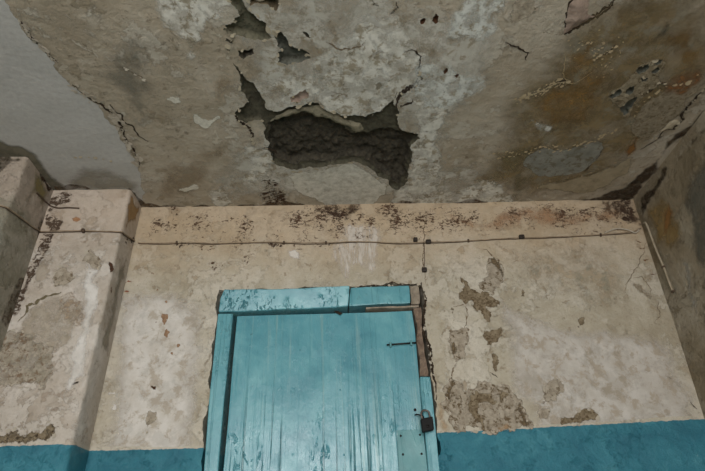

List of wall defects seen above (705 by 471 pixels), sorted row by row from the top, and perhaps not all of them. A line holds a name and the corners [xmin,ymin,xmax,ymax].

spalling [223,0,420,190]
peeling [513,0,624,104]
flaking render [609,59,666,118]
damp [0,0,705,326]
peeling [482,128,632,193]
crack [3,292,61,347]
peeling [441,249,600,435]
crack [625,242,660,320]
peeling [0,421,60,446]